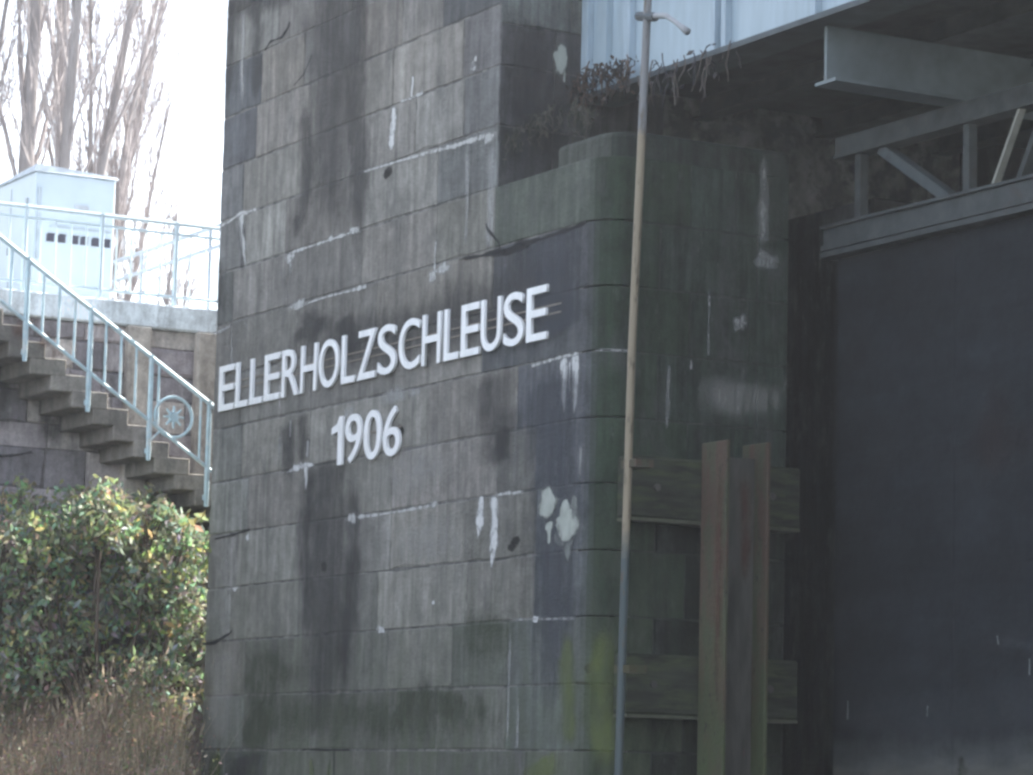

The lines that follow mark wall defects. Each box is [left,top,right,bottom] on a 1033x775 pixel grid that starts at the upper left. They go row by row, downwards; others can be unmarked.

water stain [279,417,438,727]
water stain [529,352,579,739]